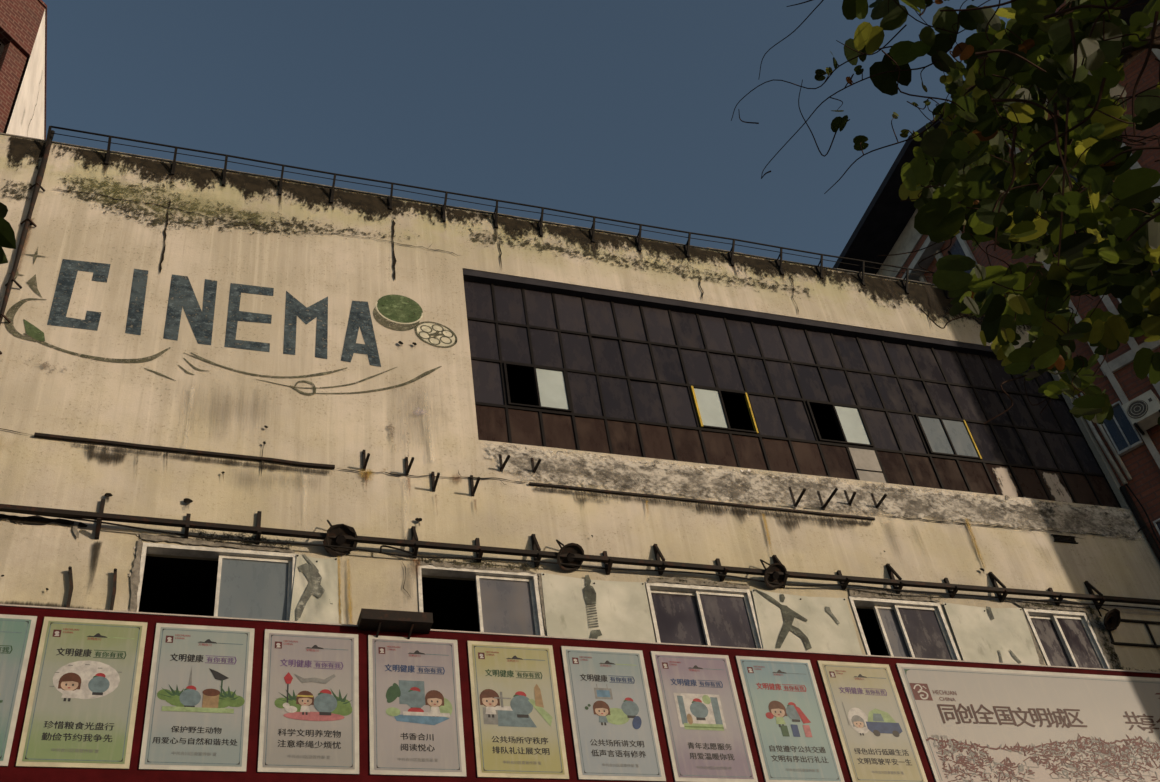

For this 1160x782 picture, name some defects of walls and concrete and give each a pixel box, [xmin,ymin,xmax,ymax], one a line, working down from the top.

crack [57,189,264,273]
crack [292,220,456,279]
damp [1,137,982,328]
damp [498,449,1136,538]